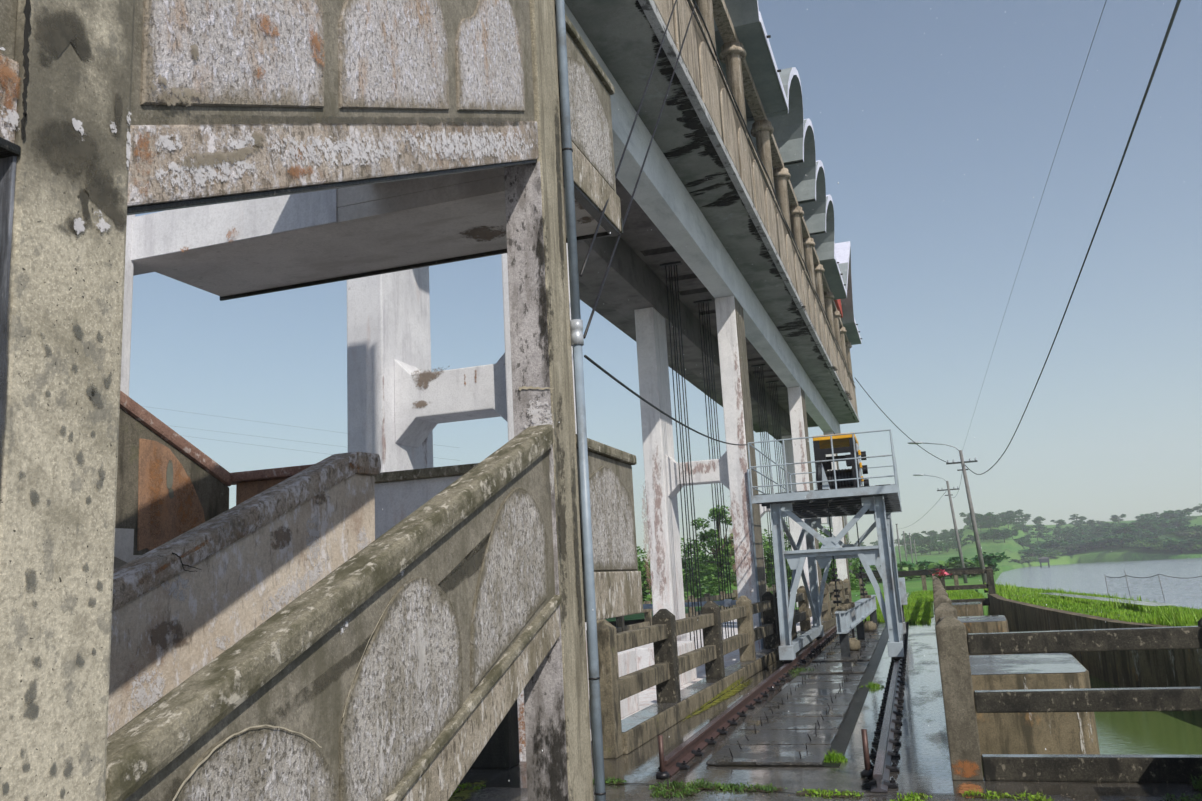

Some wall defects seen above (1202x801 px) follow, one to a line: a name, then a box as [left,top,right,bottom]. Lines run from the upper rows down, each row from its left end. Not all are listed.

water stain [35,11,91,65]
water stain [36,118,126,234]
water stain [110,94,131,170]
peeling [155,130,534,192]
water stain [534,101,594,381]
water stain [635,0,855,420]
water stain [522,396,583,635]
mould [533,718,572,801]
rust [952,760,984,798]